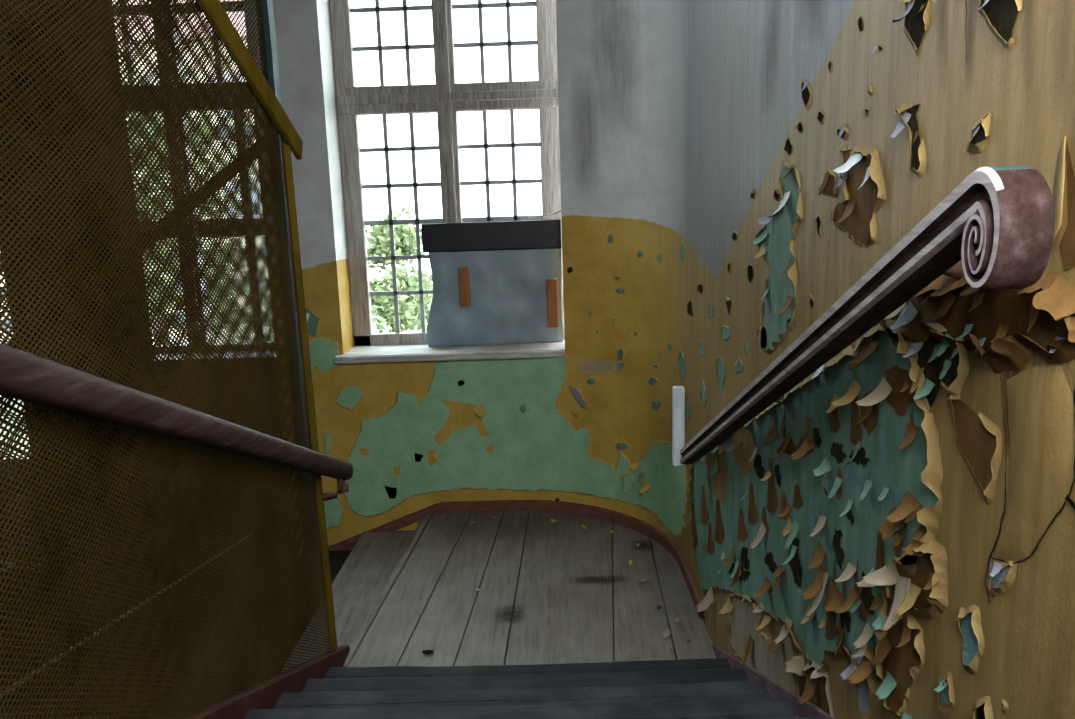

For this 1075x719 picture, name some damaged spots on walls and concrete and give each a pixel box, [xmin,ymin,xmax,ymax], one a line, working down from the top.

peeling [891,0,931,56]
peeling [978,0,1022,50]
peeling [890,102,927,178]
peeling [967,111,991,154]
peeling [685,78,887,421]
peeling [323,136,1075,719]
crack [985,376,1075,603]